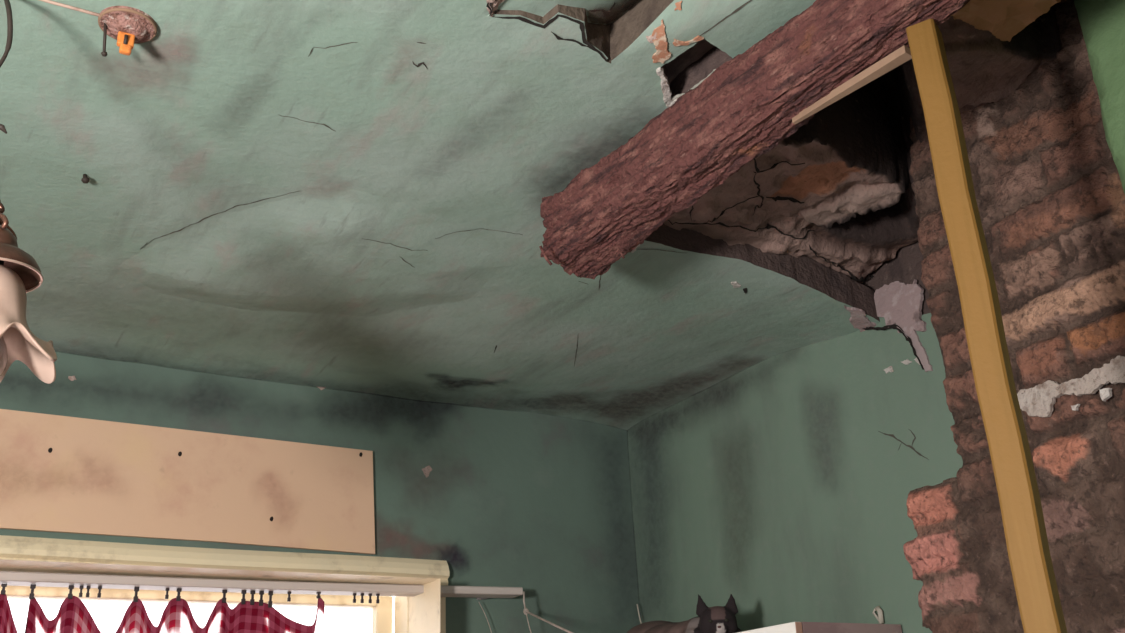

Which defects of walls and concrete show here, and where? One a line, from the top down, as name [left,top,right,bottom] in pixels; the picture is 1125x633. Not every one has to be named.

spalling [486,0,505,17]
spalling [646,19,716,108]
crack [141,191,298,249]
flaking render [951,0,1125,633]
flaking render [844,116,1024,633]
crack [878,430,926,458]